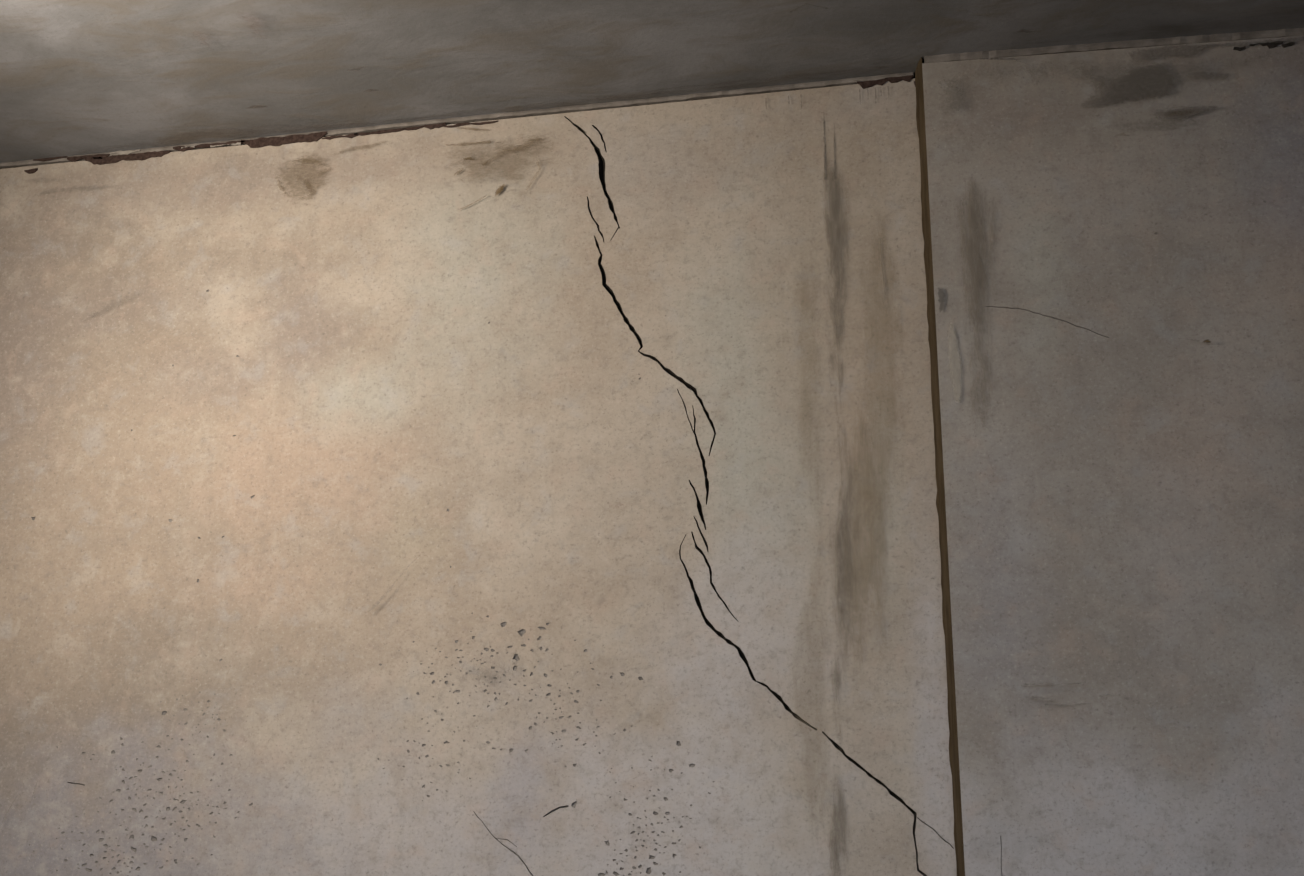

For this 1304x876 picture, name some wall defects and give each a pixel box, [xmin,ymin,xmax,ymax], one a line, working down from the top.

crack [474,812,533,876]
crack [565,116,954,876]